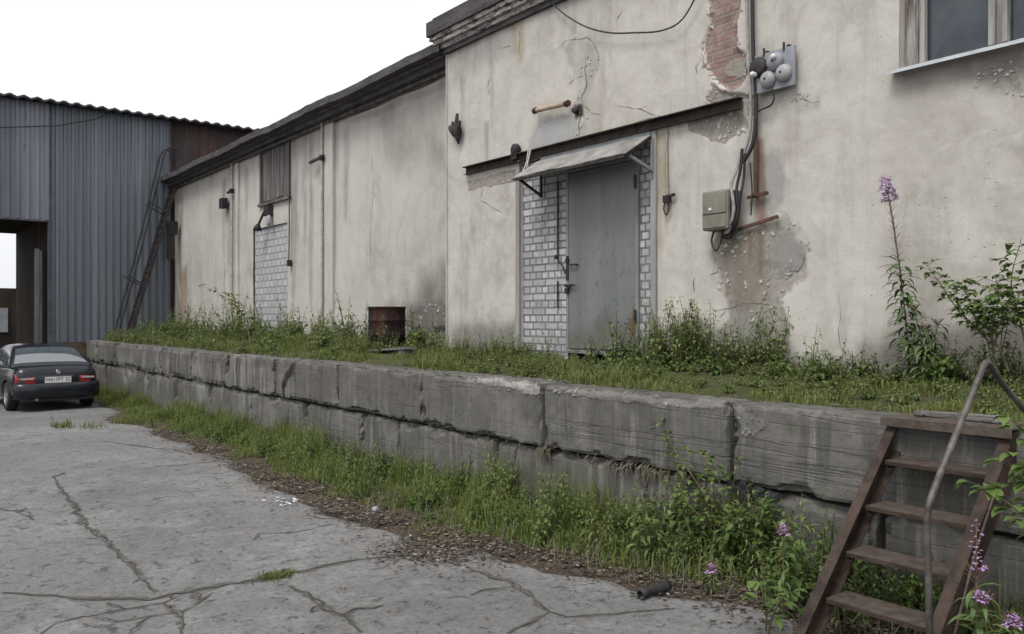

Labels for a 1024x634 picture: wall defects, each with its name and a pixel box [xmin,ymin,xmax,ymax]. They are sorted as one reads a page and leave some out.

crack [558,37,659,129]
flaking render [688,0,759,144]
flaking render [468,166,535,190]
flaking render [710,226,797,322]
spalling [477,377,768,437]
crack [400,399,870,482]